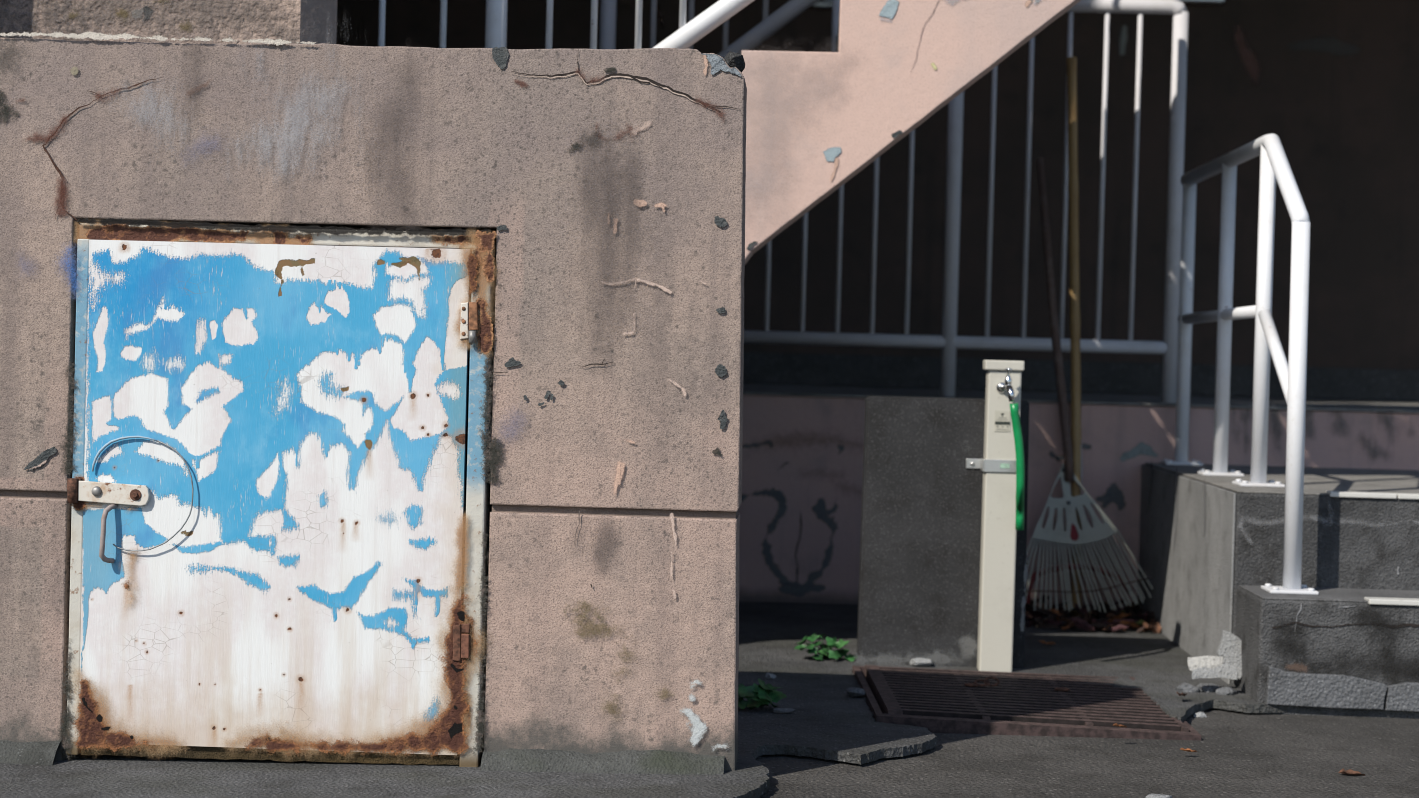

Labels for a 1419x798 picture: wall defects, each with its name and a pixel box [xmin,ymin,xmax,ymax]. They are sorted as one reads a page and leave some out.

mould [0,90,19,123]
crack [511,49,737,122]
crack [27,77,162,220]
corrosion [75,222,313,245]
corrosion [229,515,482,755]
spalling [1174,630,1242,695]
corrosion [74,675,181,752]